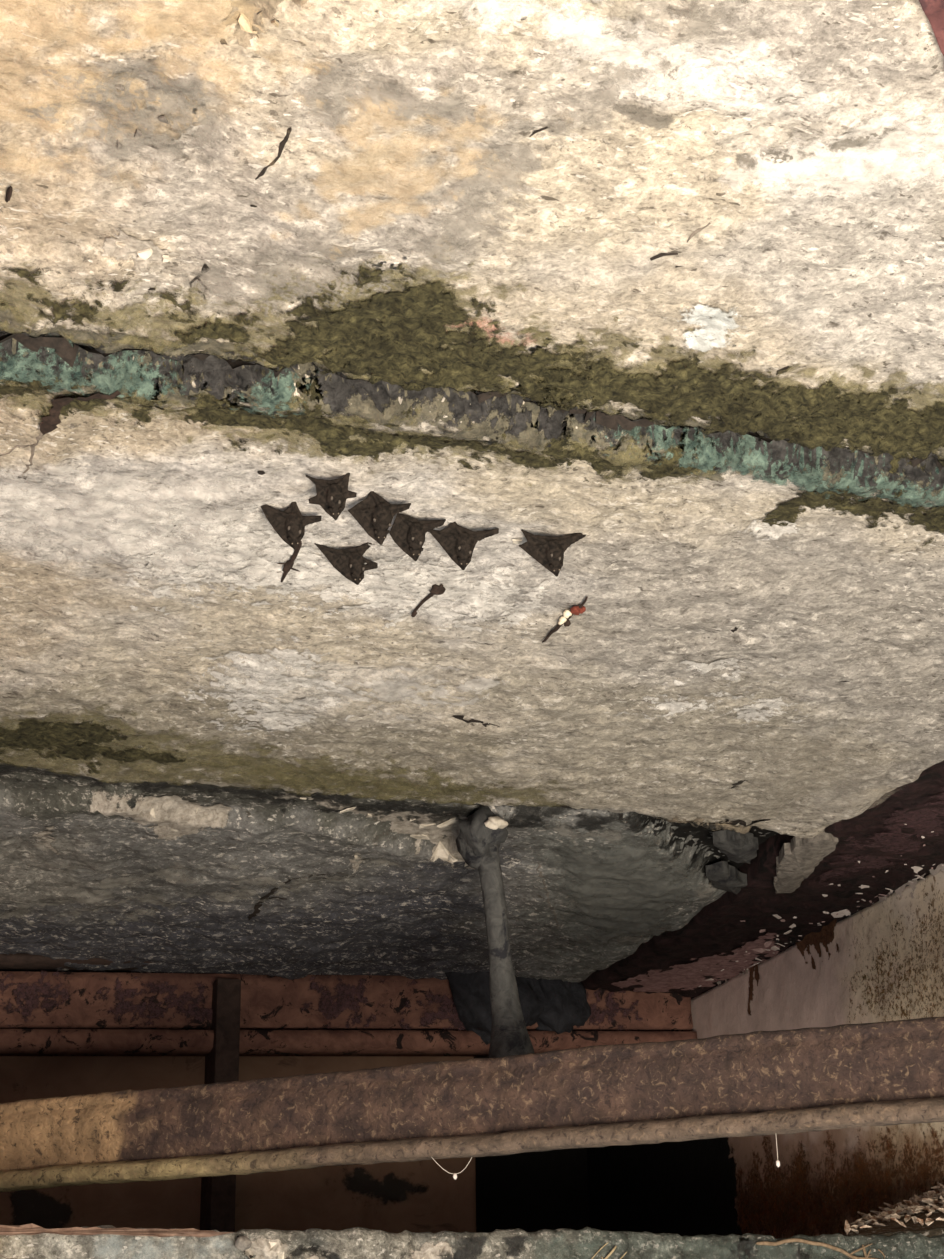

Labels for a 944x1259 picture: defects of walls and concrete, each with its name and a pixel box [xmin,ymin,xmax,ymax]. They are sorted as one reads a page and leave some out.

spalling [220,0,308,49]
crack [5,186,13,202]
crack [776,366,792,375]
crack [0,391,121,478]
water stain [0,303,944,510]
crack [138,523,178,579]
water stain [0,465,604,638]
water stain [737,520,800,554]
corrosion [0,884,944,1239]